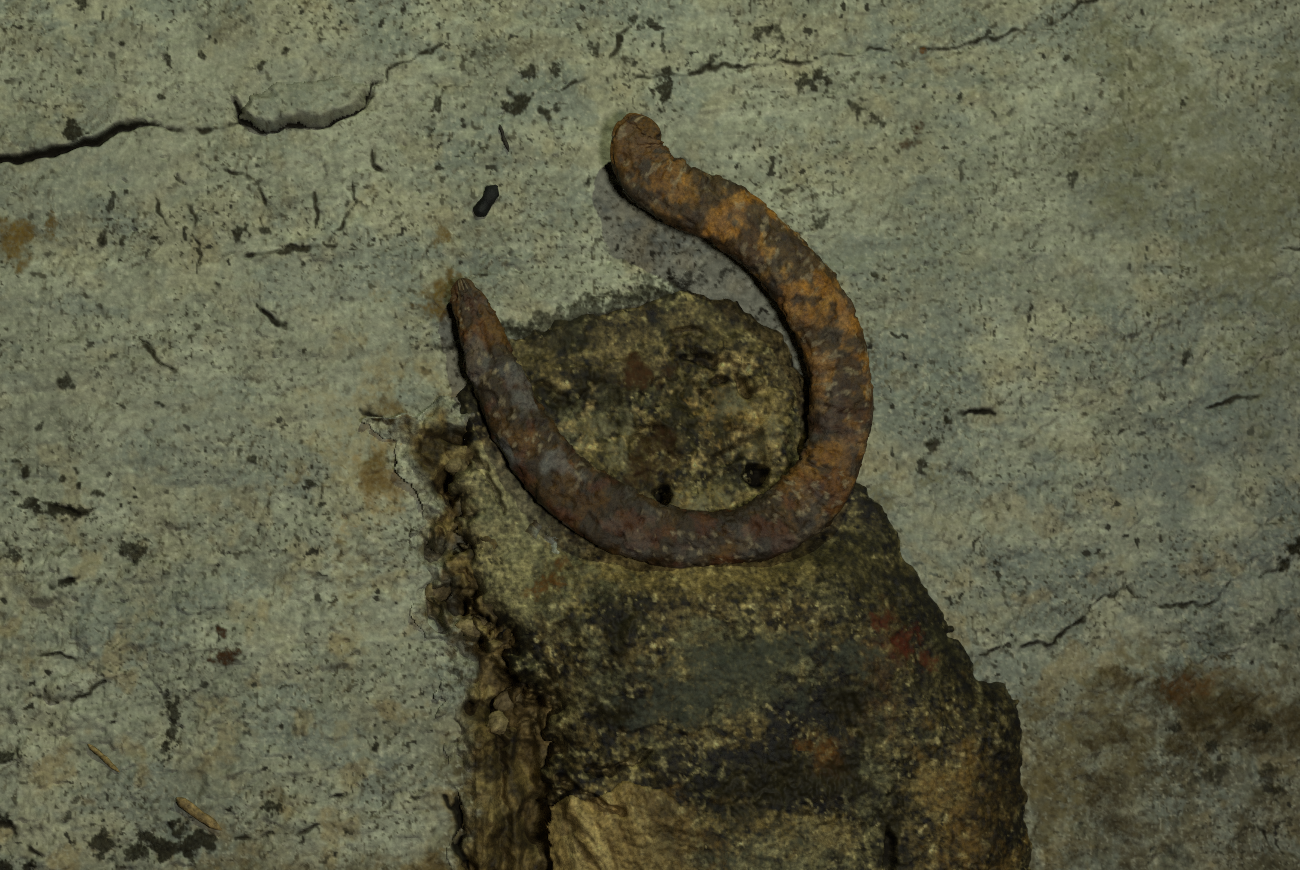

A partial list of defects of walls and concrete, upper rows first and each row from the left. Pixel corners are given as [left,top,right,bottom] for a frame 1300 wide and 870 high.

crack [0,42,446,165]
spalling [917,408,952,475]
spalling [362,396,729,870]
crack [980,583,1229,656]